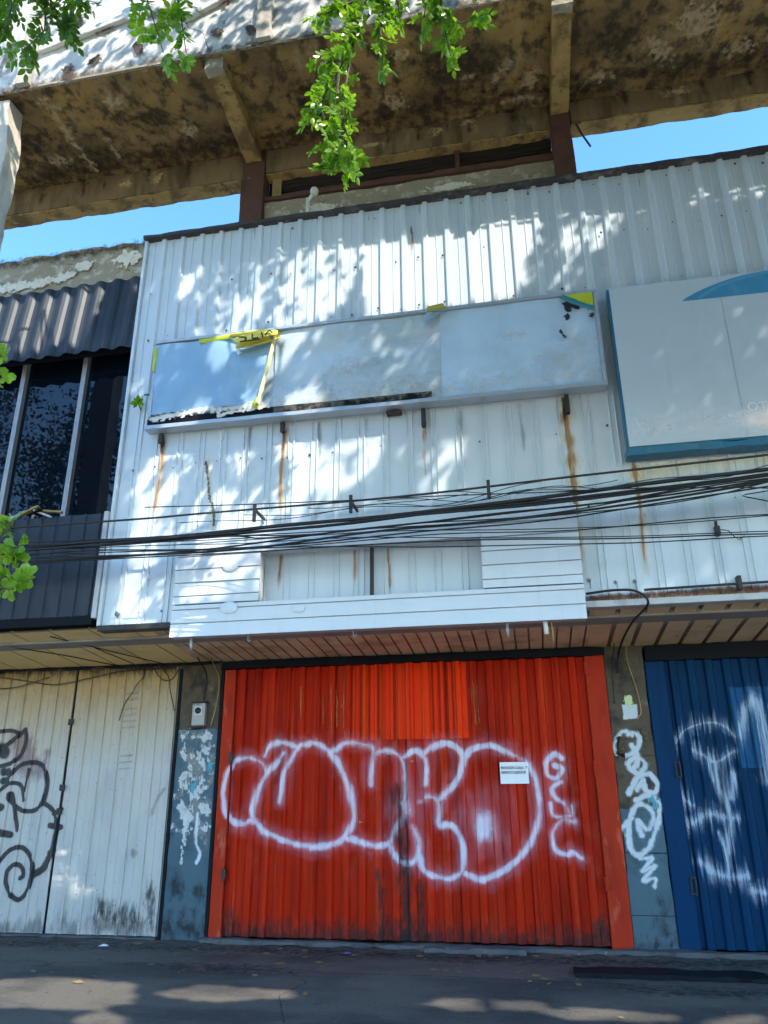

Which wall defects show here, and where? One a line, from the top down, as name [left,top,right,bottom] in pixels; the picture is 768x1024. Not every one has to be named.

water stain [0,21,346,95]
water stain [260,44,549,151]
water stain [359,0,505,26]
water stain [569,15,768,105]
water stain [15,101,240,204]
peeling [0,260,96,293]
peeling [111,249,142,269]
rust [154,440,165,511]
rust [278,429,287,521]
rust [560,397,581,551]
rust [632,462,646,563]